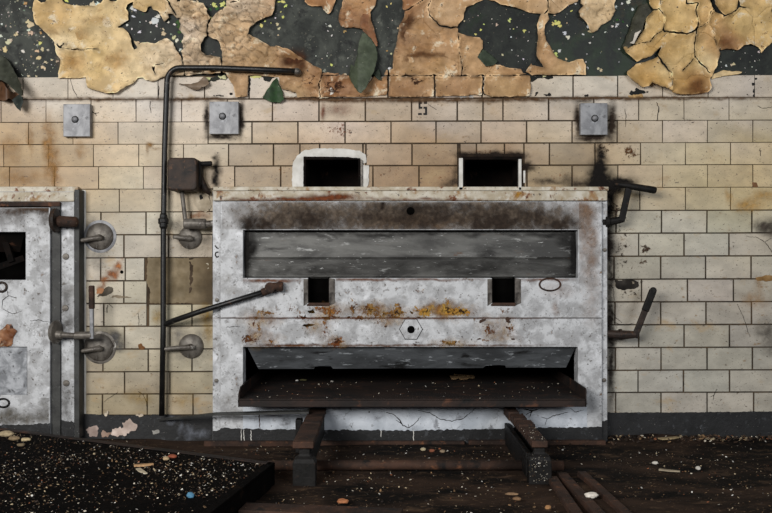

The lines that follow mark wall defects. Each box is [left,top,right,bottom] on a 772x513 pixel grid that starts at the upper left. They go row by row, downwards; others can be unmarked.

peeling [0,0,772,99]
corrosion [242,298,503,347]
peeling [86,414,143,437]
crack [386,409,474,428]